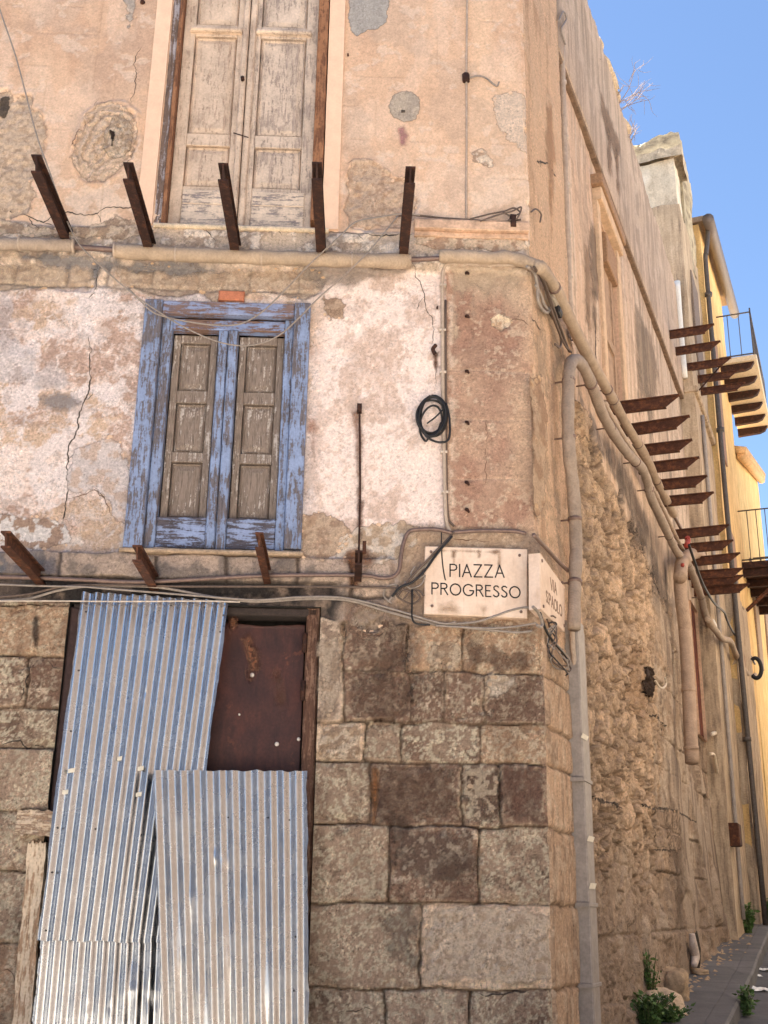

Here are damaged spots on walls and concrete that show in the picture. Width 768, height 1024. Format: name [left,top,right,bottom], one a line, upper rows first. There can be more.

peeling [493,91,527,153]
spalling [0,91,139,240]
spalling [344,159,417,231]
crack [63,338,110,519]
peeling [301,511,419,567]